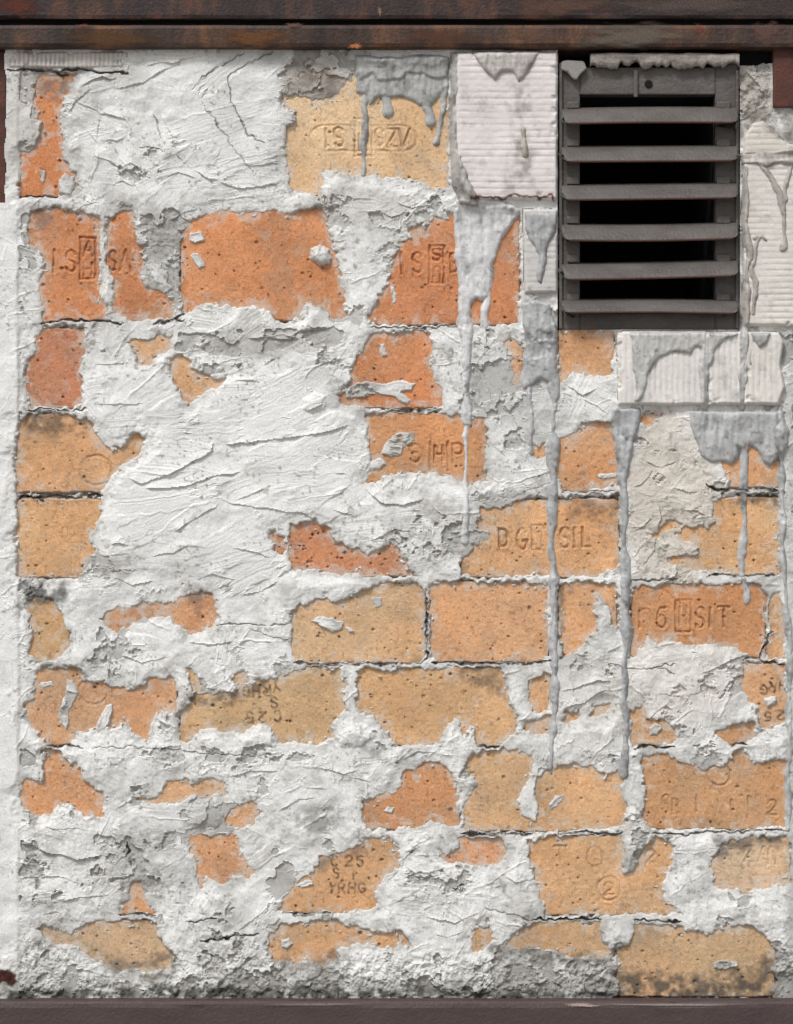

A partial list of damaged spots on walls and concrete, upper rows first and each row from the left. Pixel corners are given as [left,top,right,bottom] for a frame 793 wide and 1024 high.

crack [22,67,129,77]
damp [359,94,394,177]
rust [525,0,602,15]
rust [592,26,682,46]
rust [627,0,743,11]
spalling [15,72,449,580]
spalling [338,215,487,485]
spalling [471,216,521,326]
spalling [20,422,791,998]
damp [526,359,561,771]
damp [618,488,633,780]
damp [737,449,751,605]